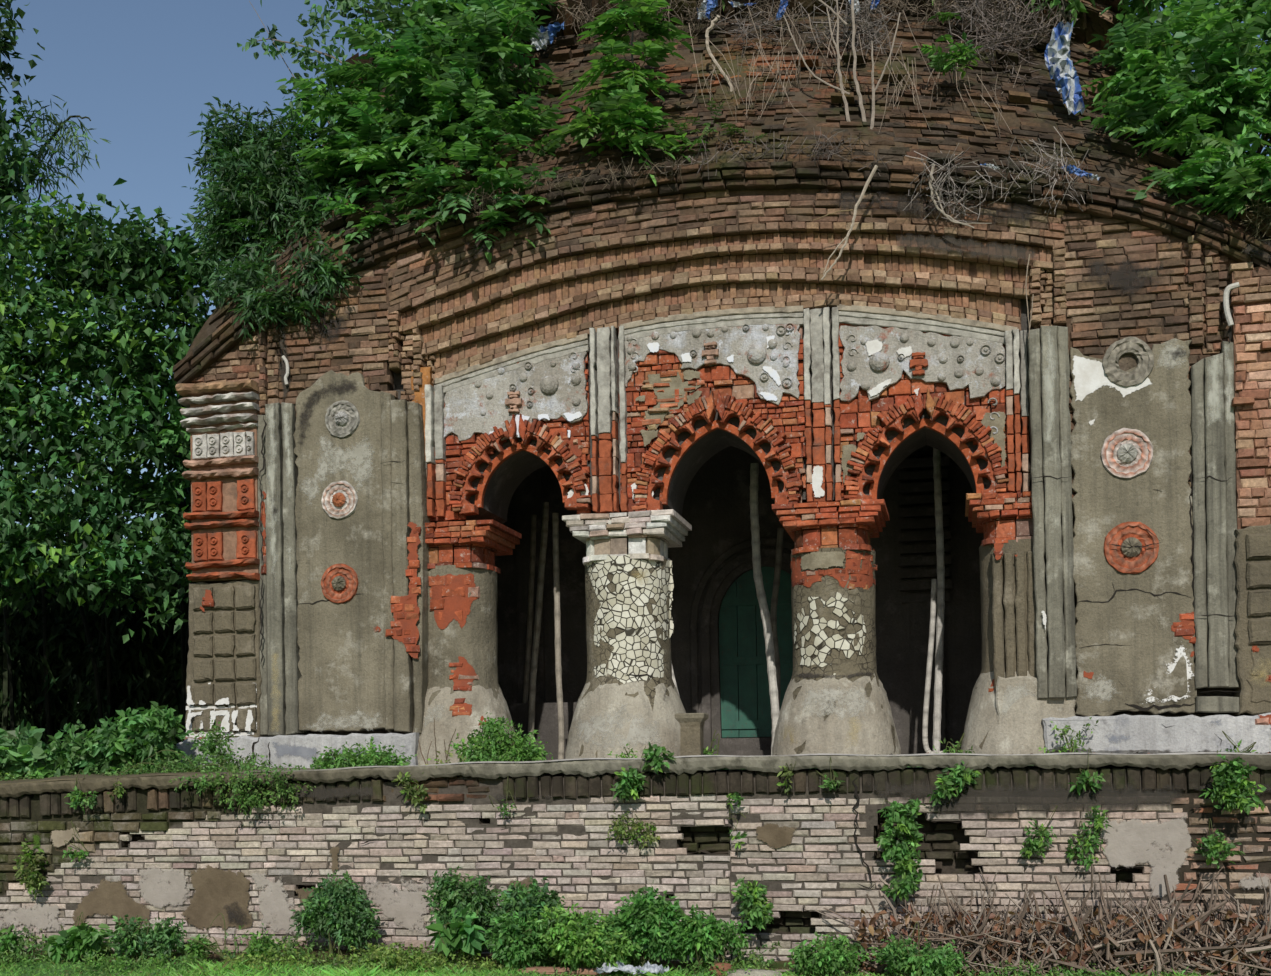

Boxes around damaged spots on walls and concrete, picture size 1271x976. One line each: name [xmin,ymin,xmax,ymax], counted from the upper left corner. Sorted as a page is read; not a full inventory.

peeling [866,340,912,358]
spalling [635,353,705,446]
peeling [760,366,781,401]
peeling [868,379,891,396]
peeling [1072,356,1152,401]
peeling [515,414,550,437]
spalling [544,411,583,460]
spalling [981,411,1007,467]
peeling [811,466,825,498]
crack [1076,432,1232,617]
spalling [373,522,480,659]
spalling [1171,612,1196,657]